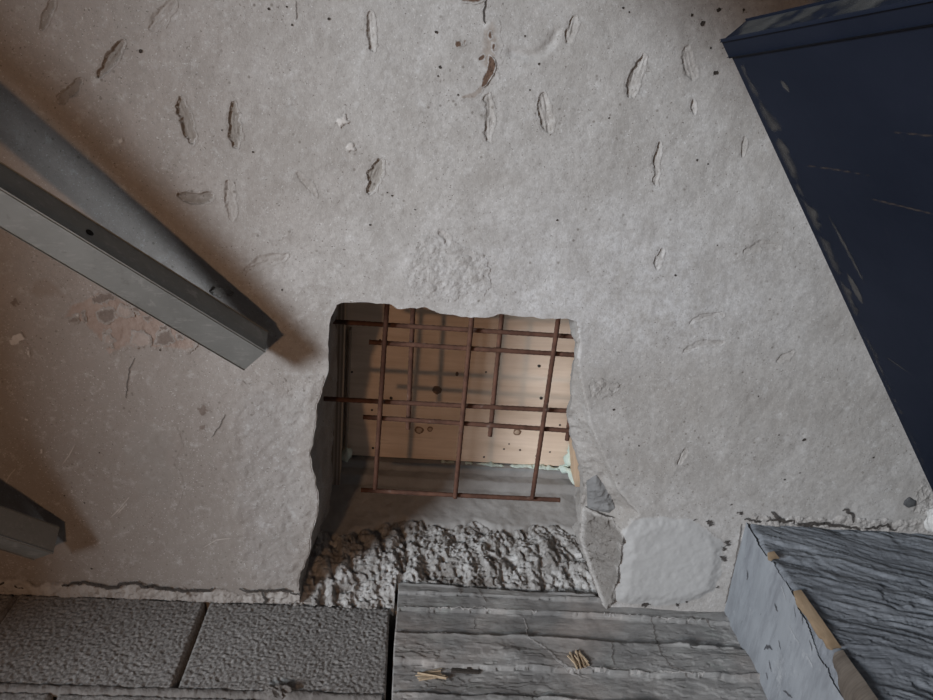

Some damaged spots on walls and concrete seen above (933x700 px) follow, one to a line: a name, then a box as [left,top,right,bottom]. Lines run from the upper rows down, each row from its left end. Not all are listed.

corrosion [460,16,503,100]
spalling [624,51,648,99]
spalling [173,94,198,147]
spalling [221,100,244,150]
spalling [365,157,393,196]
peeling [61,290,198,356]
spalling [218,304,625,617]
crack [725,509,896,603]
crack [62,581,213,593]
crack [239,589,301,604]